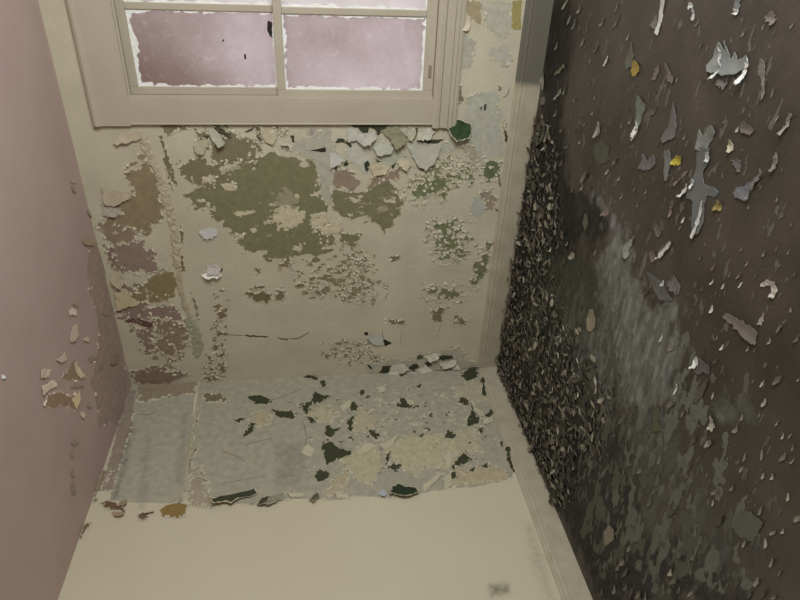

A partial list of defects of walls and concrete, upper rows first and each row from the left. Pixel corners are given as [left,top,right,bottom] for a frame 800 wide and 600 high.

flaking render [461,0,524,69]
peeling [649,0,665,35]
peeling [706,40,747,90]
peeling [757,58,766,100]
peeling [638,102,722,235]
peeling [726,139,742,172]
peeling [733,182,751,202]
peeling [41,83,515,522]
peeling [586,309,596,332]
leakage [501,3,708,600]
peeling [722,312,765,345]
peeling [760,280,778,299]